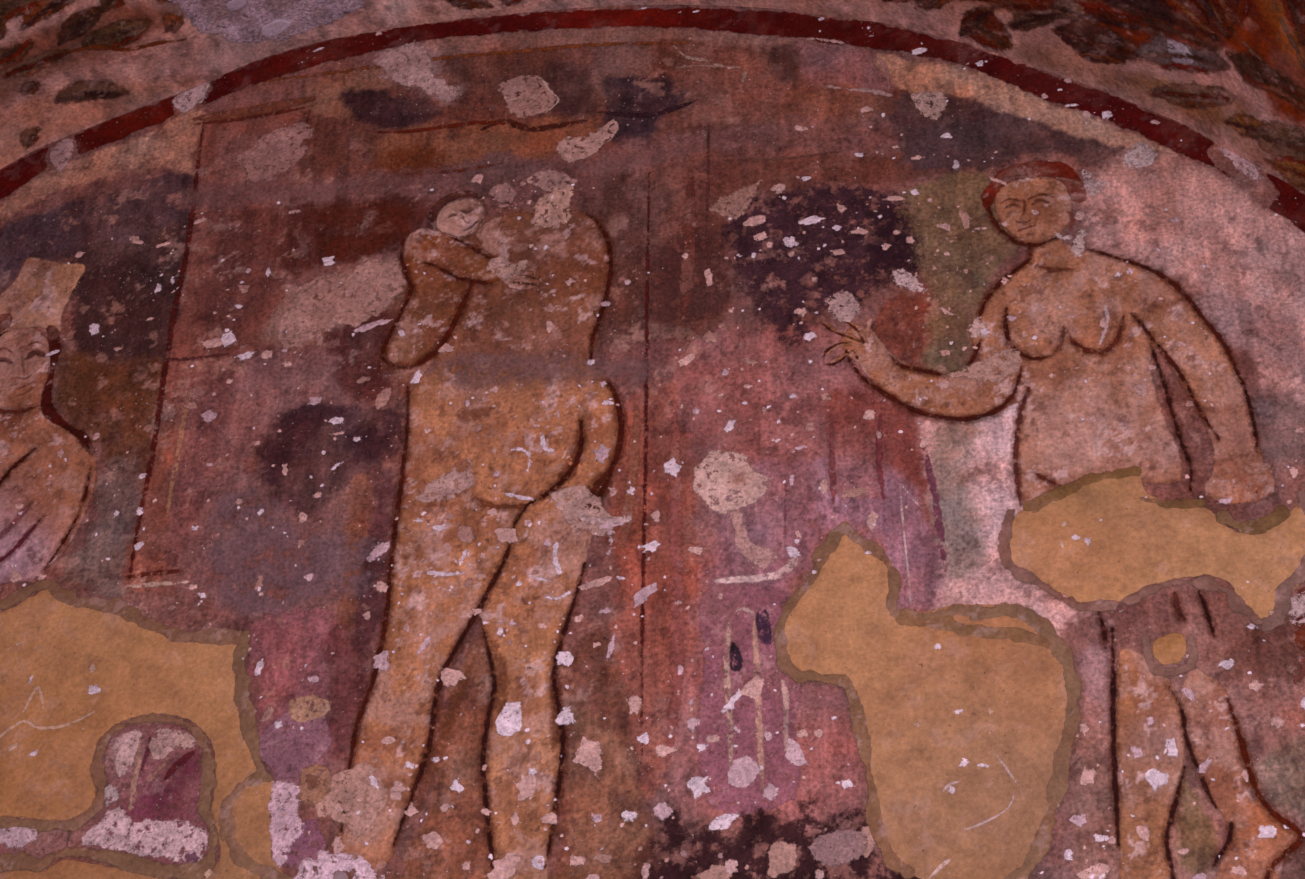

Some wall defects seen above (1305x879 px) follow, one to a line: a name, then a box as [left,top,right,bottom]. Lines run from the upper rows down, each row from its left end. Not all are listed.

peeling [498,75,559,118]
peeling [471,118,619,229]
peeling [488,244,547,280]
peeling [543,274,587,342]
peeling [438,336,457,352]
peeling [438,386,498,407]
peeling [653,449,802,570]
peeling [634,846,688,879]
peeling [696,853,749,879]
peeling [767,826,876,879]